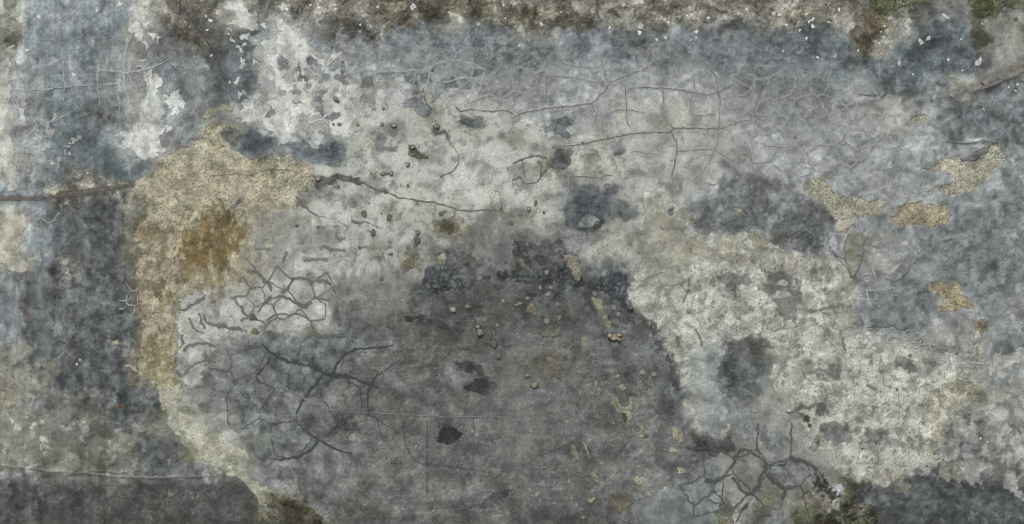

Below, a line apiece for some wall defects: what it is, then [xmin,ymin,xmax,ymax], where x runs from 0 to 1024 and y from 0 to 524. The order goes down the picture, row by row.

peeling [0,339,104,482]
flaking render [110,0,367,519]
leakage [187,210,735,524]
crack [173,52,882,485]
leakage [151,0,1024,401]
crack [643,234,947,524]
peeling [627,186,1024,501]
flaking render [803,144,1005,228]